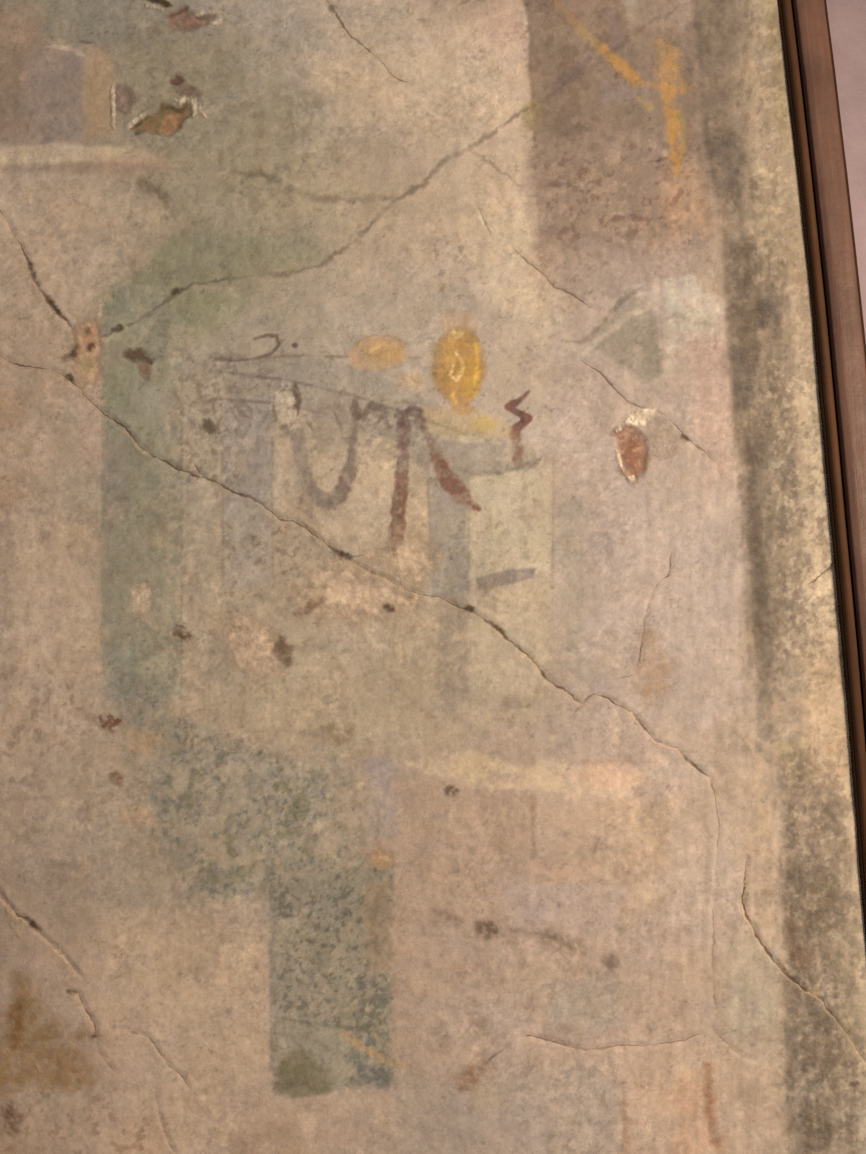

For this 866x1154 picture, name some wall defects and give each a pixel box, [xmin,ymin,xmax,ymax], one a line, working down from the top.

spalling [146,0,222,31]
spalling [111,76,207,136]
crack [20,243,79,321]
crack [95,405,248,497]
spalling [615,408,678,482]
crack [294,521,377,575]
crack [465,606,573,696]
crack [12,912,67,962]
crack [742,876,833,1015]